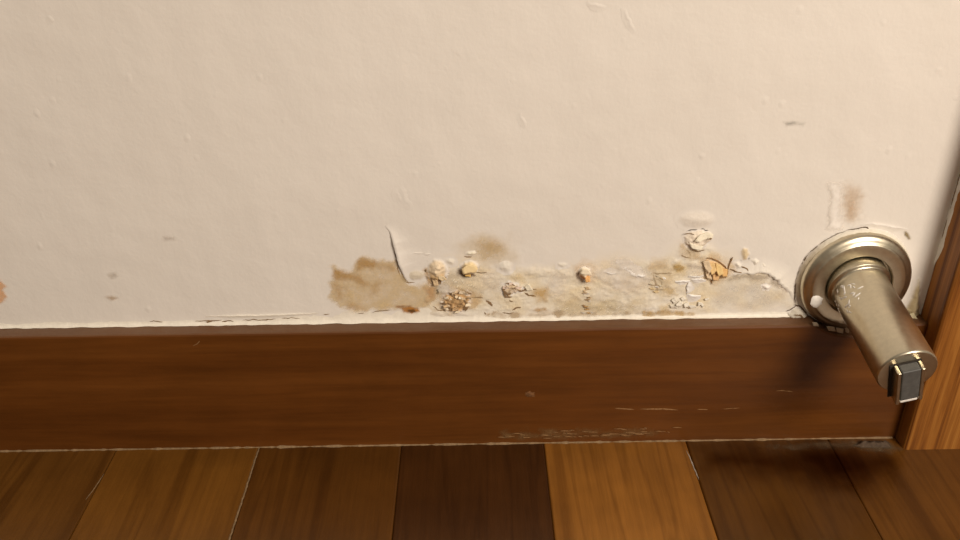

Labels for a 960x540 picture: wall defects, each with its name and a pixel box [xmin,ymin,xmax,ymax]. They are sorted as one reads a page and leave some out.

crack [385,222,431,283]
spalling [433,288,493,314]
spalling [501,280,537,314]
leakage [331,231,804,317]
peeling [670,256,799,309]